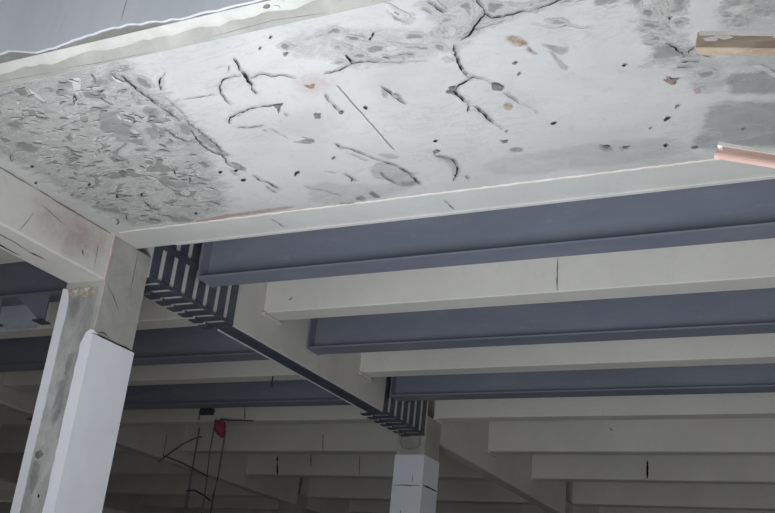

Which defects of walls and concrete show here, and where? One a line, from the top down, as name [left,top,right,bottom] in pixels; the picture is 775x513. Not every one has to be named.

crack [0,156,127,267]
peeling [0,62,224,224]
crack [64,51,295,188]
crack [336,144,420,185]
crack [453,0,585,128]